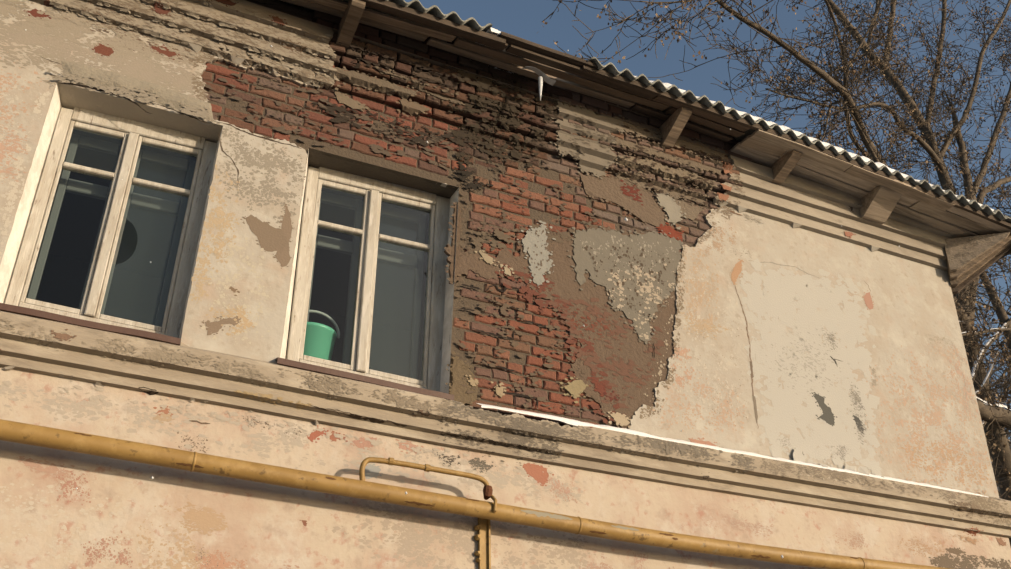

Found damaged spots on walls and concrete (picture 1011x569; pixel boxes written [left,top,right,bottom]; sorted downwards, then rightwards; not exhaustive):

spalling [0,0,197,77]
flaking render [200,10,752,428]
crack [735,286,758,425]
spalling [522,459,554,486]